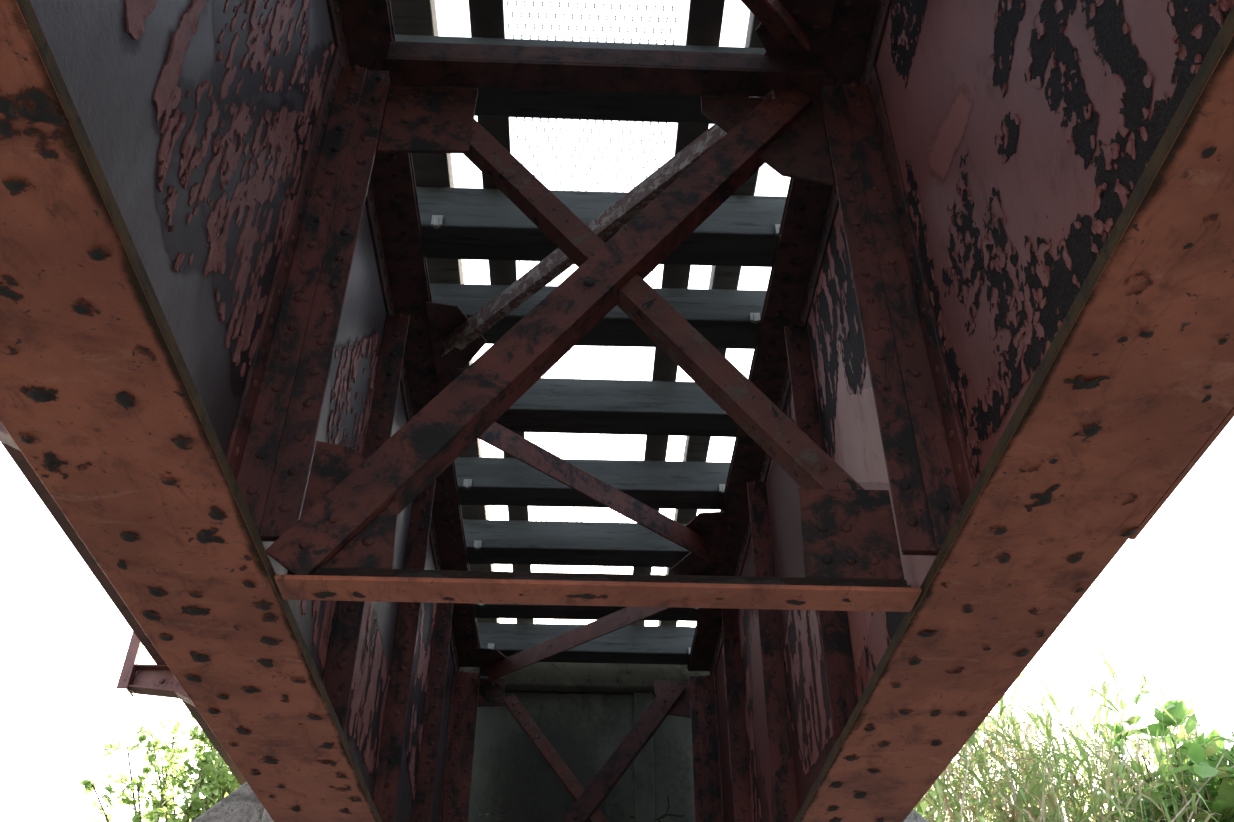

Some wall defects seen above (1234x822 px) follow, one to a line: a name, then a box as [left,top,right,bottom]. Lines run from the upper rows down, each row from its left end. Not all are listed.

rust [0,88,68,159]
peeling [153,0,335,397]
peeling [904,0,1231,478]
rust [20,386,59,402]
rust [19,431,92,479]
rust [182,506,228,544]
peeling [807,224,866,460]
rust [1024,484,1063,512]
rust [239,555,283,668]
peeling [346,601,390,778]
peeling [404,602,437,803]
peeling [783,610,837,777]